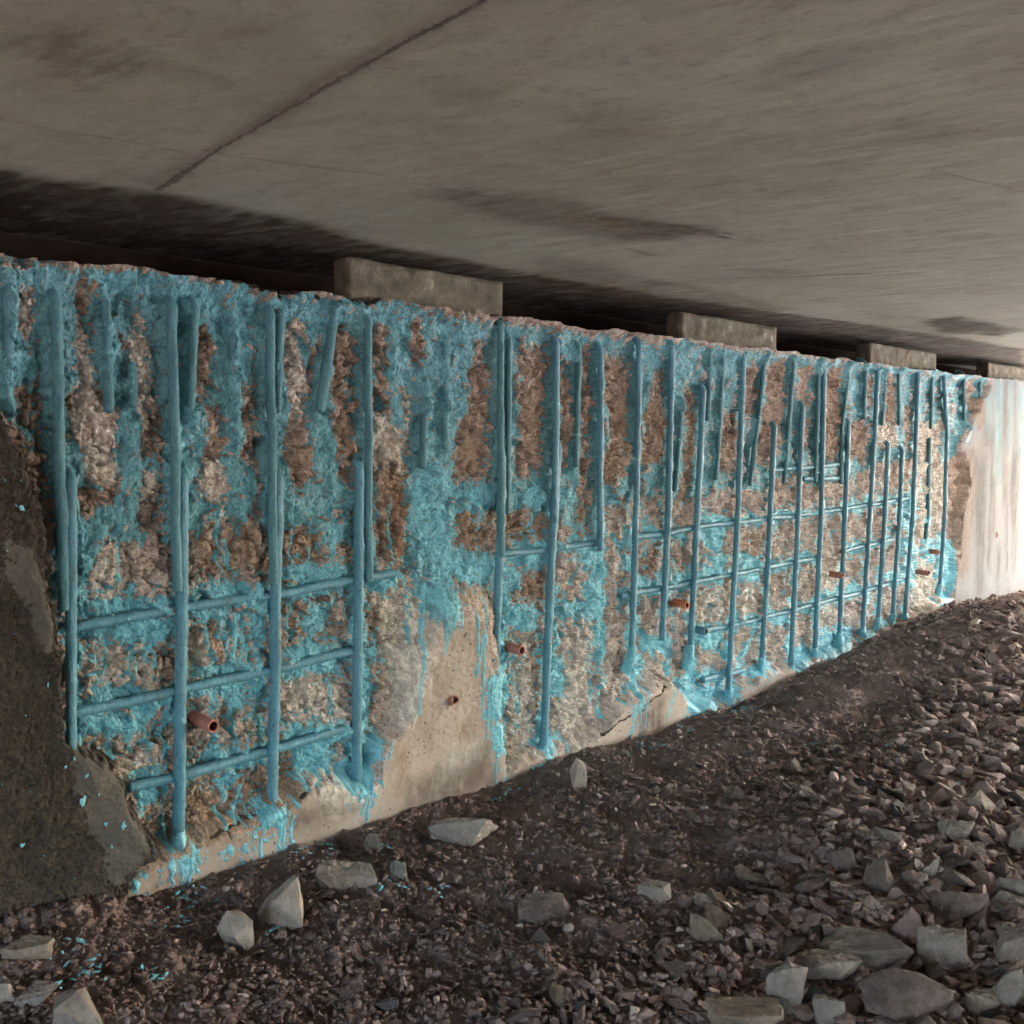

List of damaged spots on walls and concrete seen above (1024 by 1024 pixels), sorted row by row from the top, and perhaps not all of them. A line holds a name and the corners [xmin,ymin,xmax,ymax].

spalling [0,253,992,896]
crack [600,685,667,736]